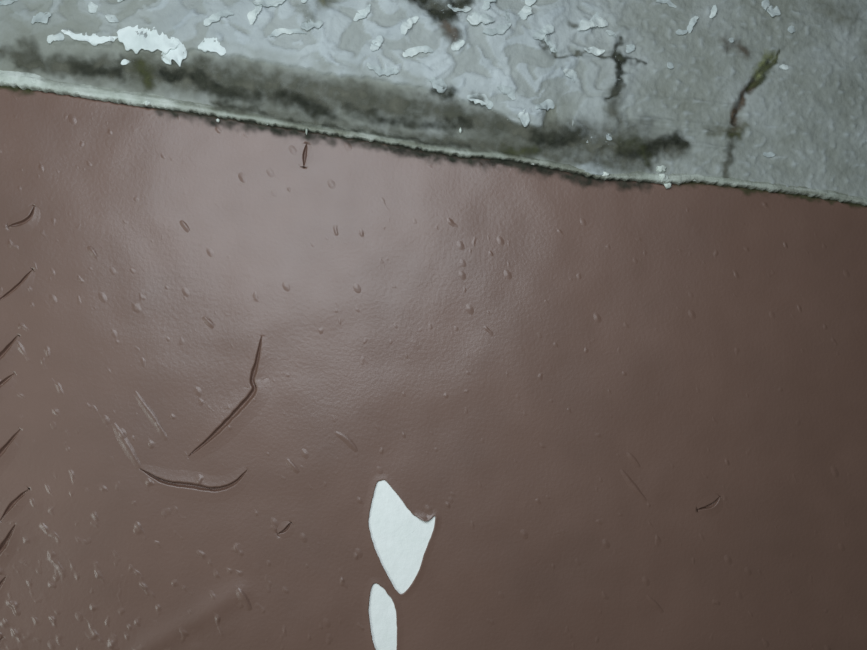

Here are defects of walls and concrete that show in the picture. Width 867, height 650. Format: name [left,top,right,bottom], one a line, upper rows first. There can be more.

peeling [47,1,187,67]
peeling [198,38,226,56]
crack [296,144,314,167]
leakage [0,42,688,188]
flaking render [0,69,867,206]
peeling [447,0,537,35]
crack [544,37,647,123]
peeling [676,5,717,35]
crack [0,332,22,403]
crack [136,335,271,503]
crack [0,426,31,610]
peeling [362,473,442,650]